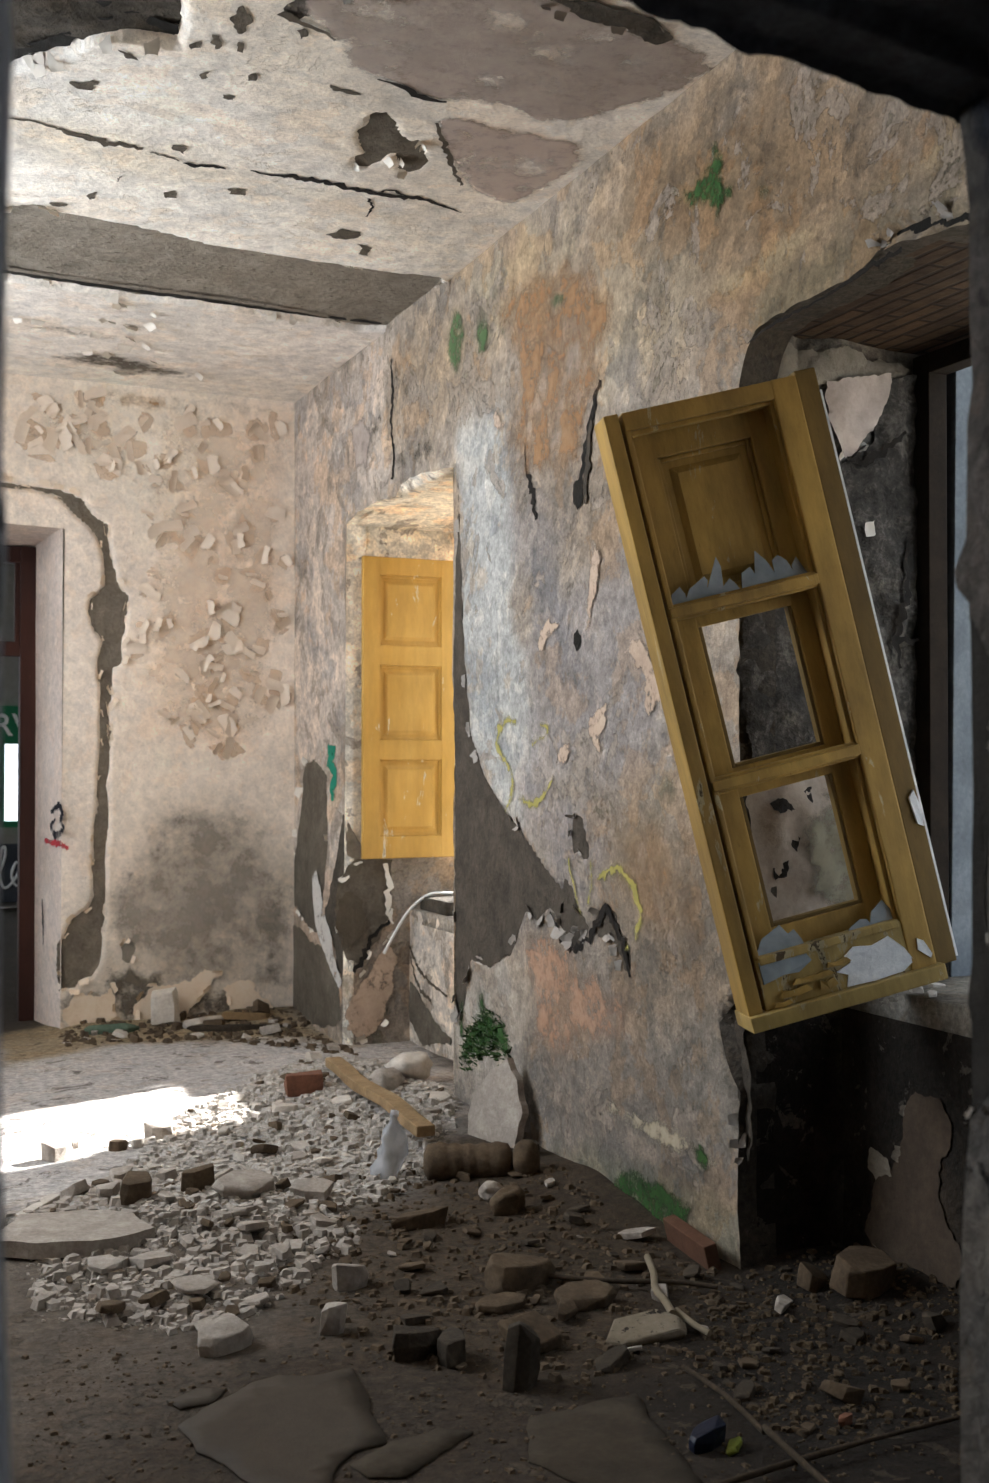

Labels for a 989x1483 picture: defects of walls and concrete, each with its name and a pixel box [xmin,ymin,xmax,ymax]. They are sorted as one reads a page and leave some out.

spalling [541,0,673,45]
crack [11,118,462,217]
spalling [351,112,428,180]
crack [748,247,902,343]
spalling [6,192,444,759]
spalling [291,484,631,1046]
water stain [116,817,286,973]
peeling [746,775,854,921]
spalling [775,342,989,1289]
water stain [112,969,160,1020]
peeling [61,969,273,1026]
water stain [193,990,230,1012]